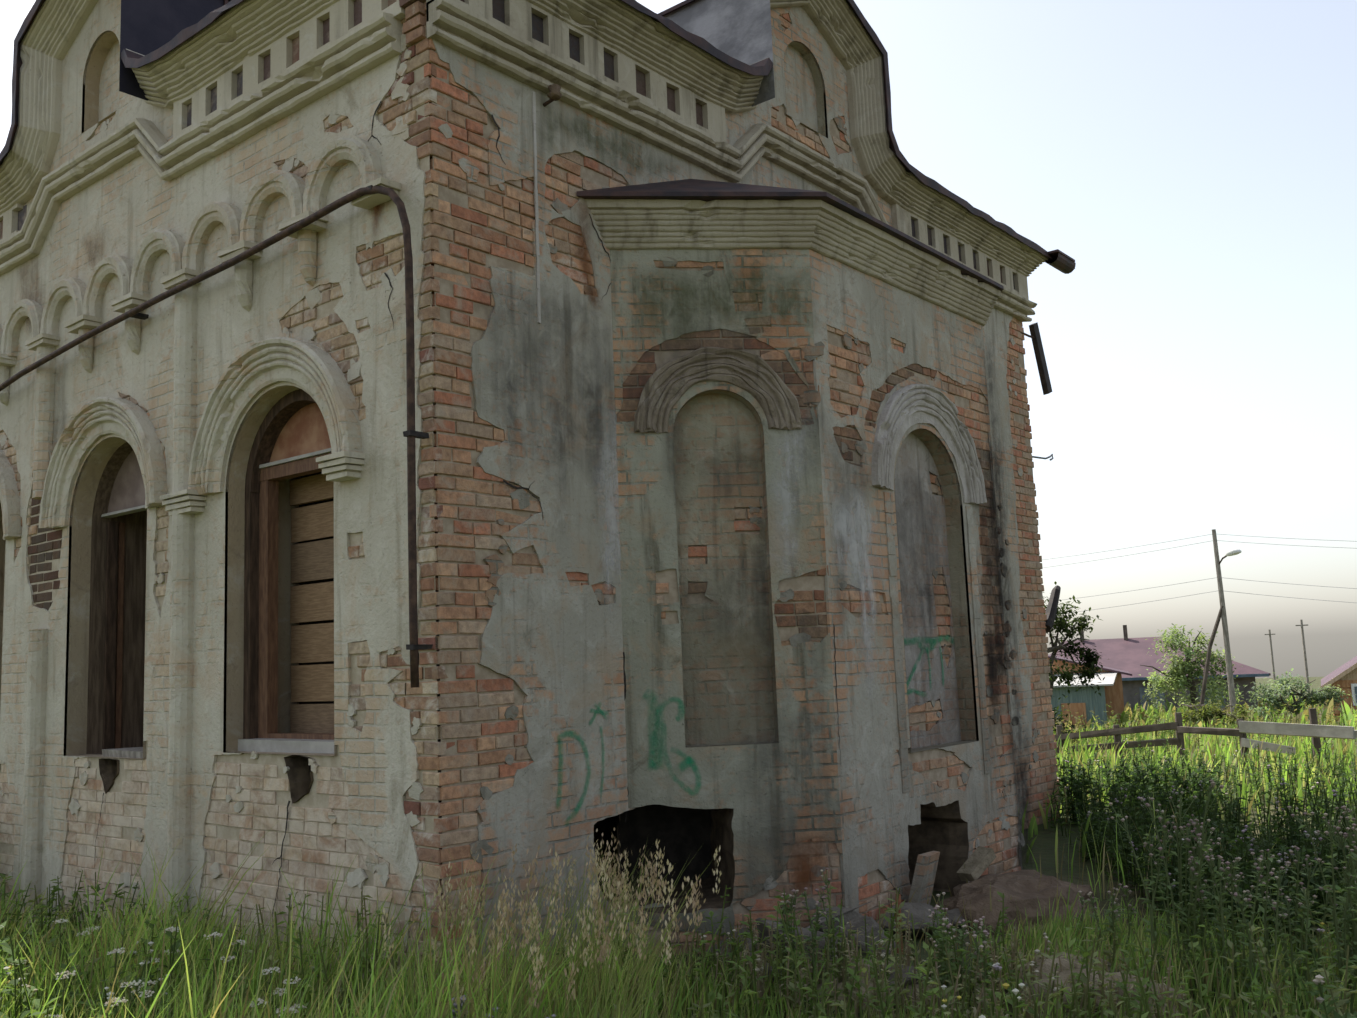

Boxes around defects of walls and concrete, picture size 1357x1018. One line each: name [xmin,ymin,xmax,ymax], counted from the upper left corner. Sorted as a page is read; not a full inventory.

spalling [197,1,627,999]
spalling [616,292,937,467]
spalling [774,565,887,648]
spalling [858,317,1060,924]
damp [979,446,1030,859]
spalling [594,804,845,957]